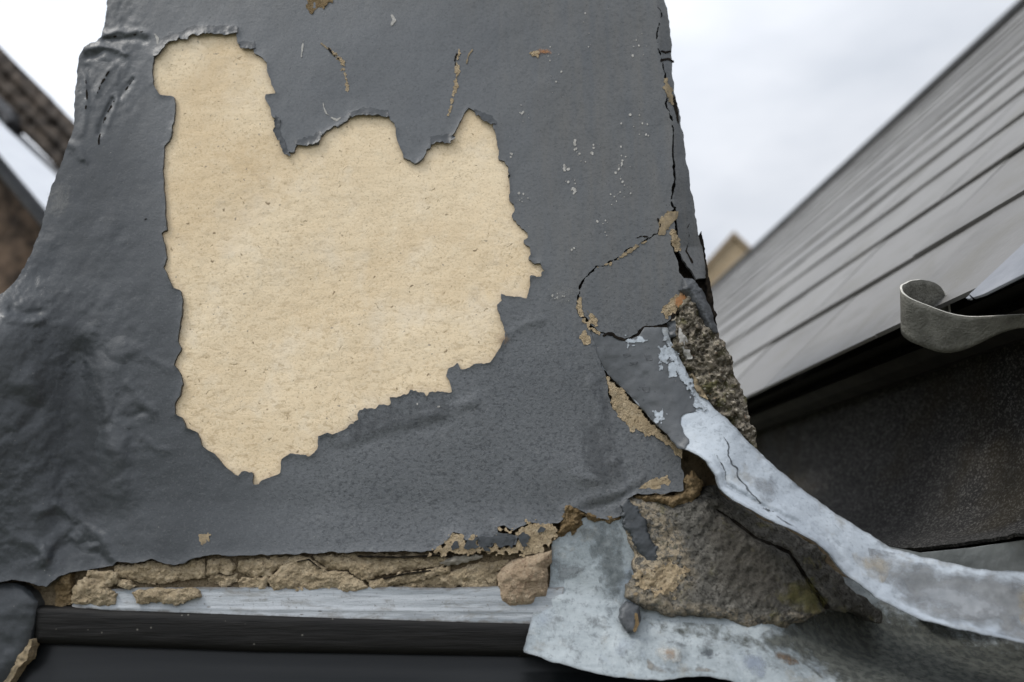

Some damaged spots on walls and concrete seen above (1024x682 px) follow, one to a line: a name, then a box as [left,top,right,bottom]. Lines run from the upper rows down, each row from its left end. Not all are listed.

crack [576,16,693,341]
peeling [152,25,544,485]
peeling [625,292,708,411]
spalling [606,376,683,458]
spalling [639,475,671,496]
peeling [428,519,558,558]
spalling [631,559,690,600]